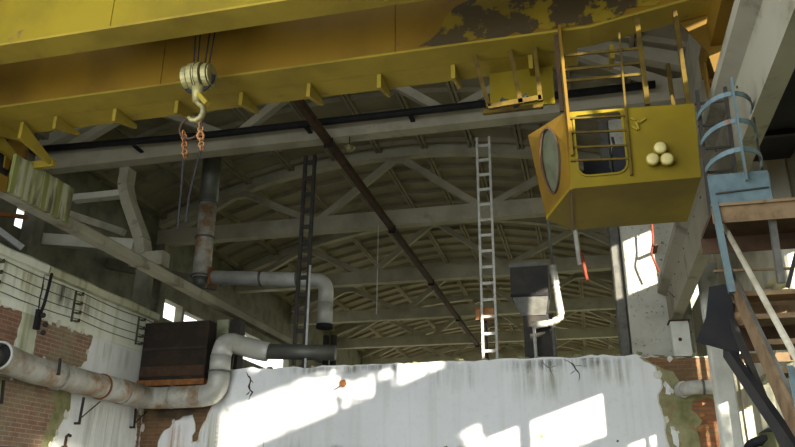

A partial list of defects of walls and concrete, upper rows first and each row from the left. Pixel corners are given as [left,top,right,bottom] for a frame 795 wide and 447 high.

spalling [0,300,23,346]
spalling [32,316,93,368]
spalling [134,403,216,447]
spalling [639,355,720,447]